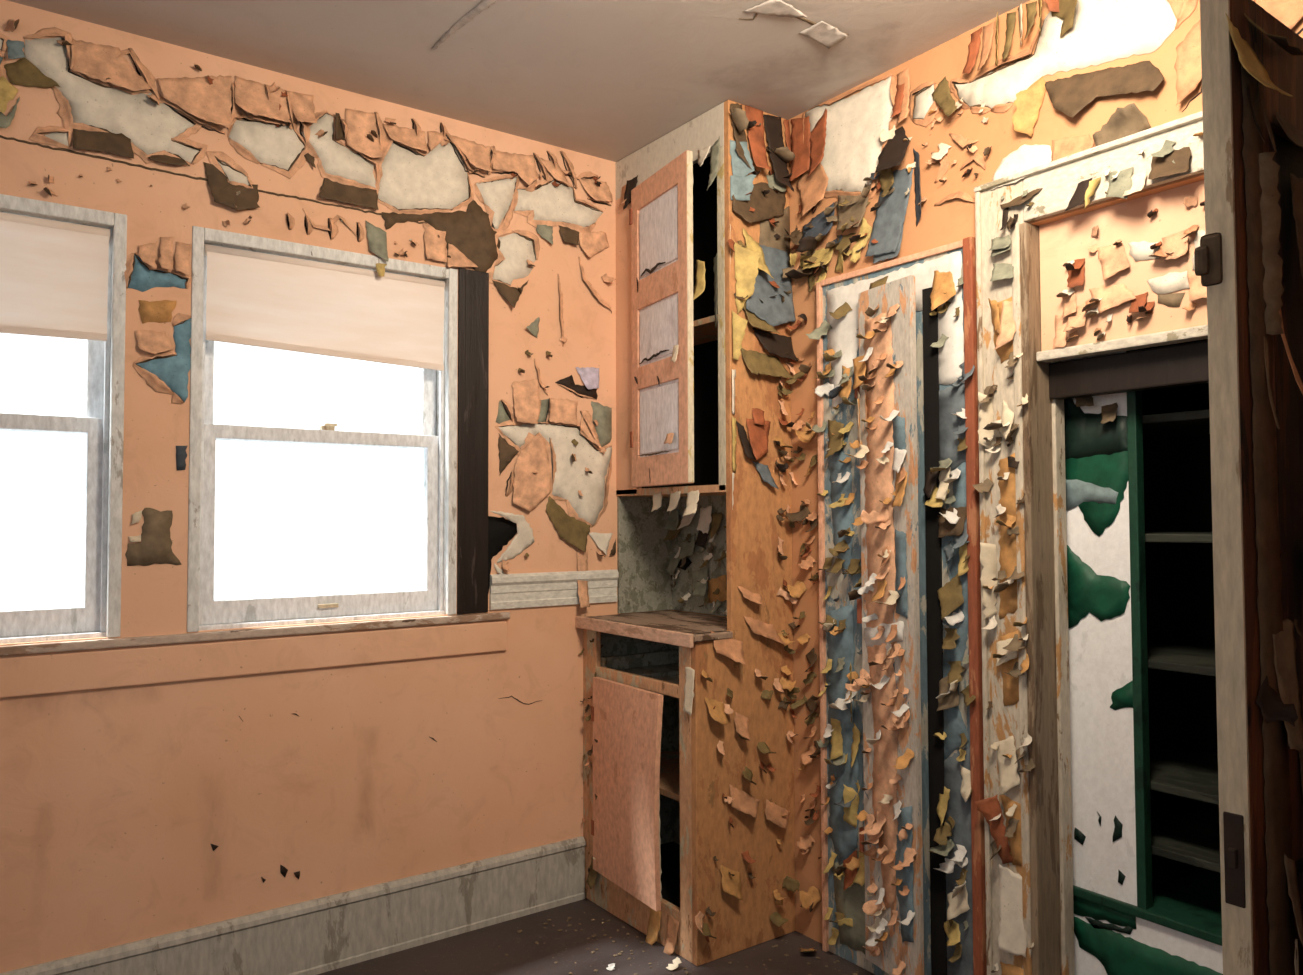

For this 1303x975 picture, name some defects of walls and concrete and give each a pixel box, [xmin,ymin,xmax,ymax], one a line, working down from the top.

peeling [0,19,617,314]
peeling [124,236,192,404]
peeling [728,0,1207,510]
peeling [125,508,181,566]
peeling [491,274,616,608]
peeling [1064,396,1128,536]
peeling [1067,545,1130,629]
peeling [1225,13,1303,975]
peeling [1110,680,1133,710]
peeling [975,734,1036,975]
peeling [1097,812,1123,842]
peeling [1073,895,1223,975]